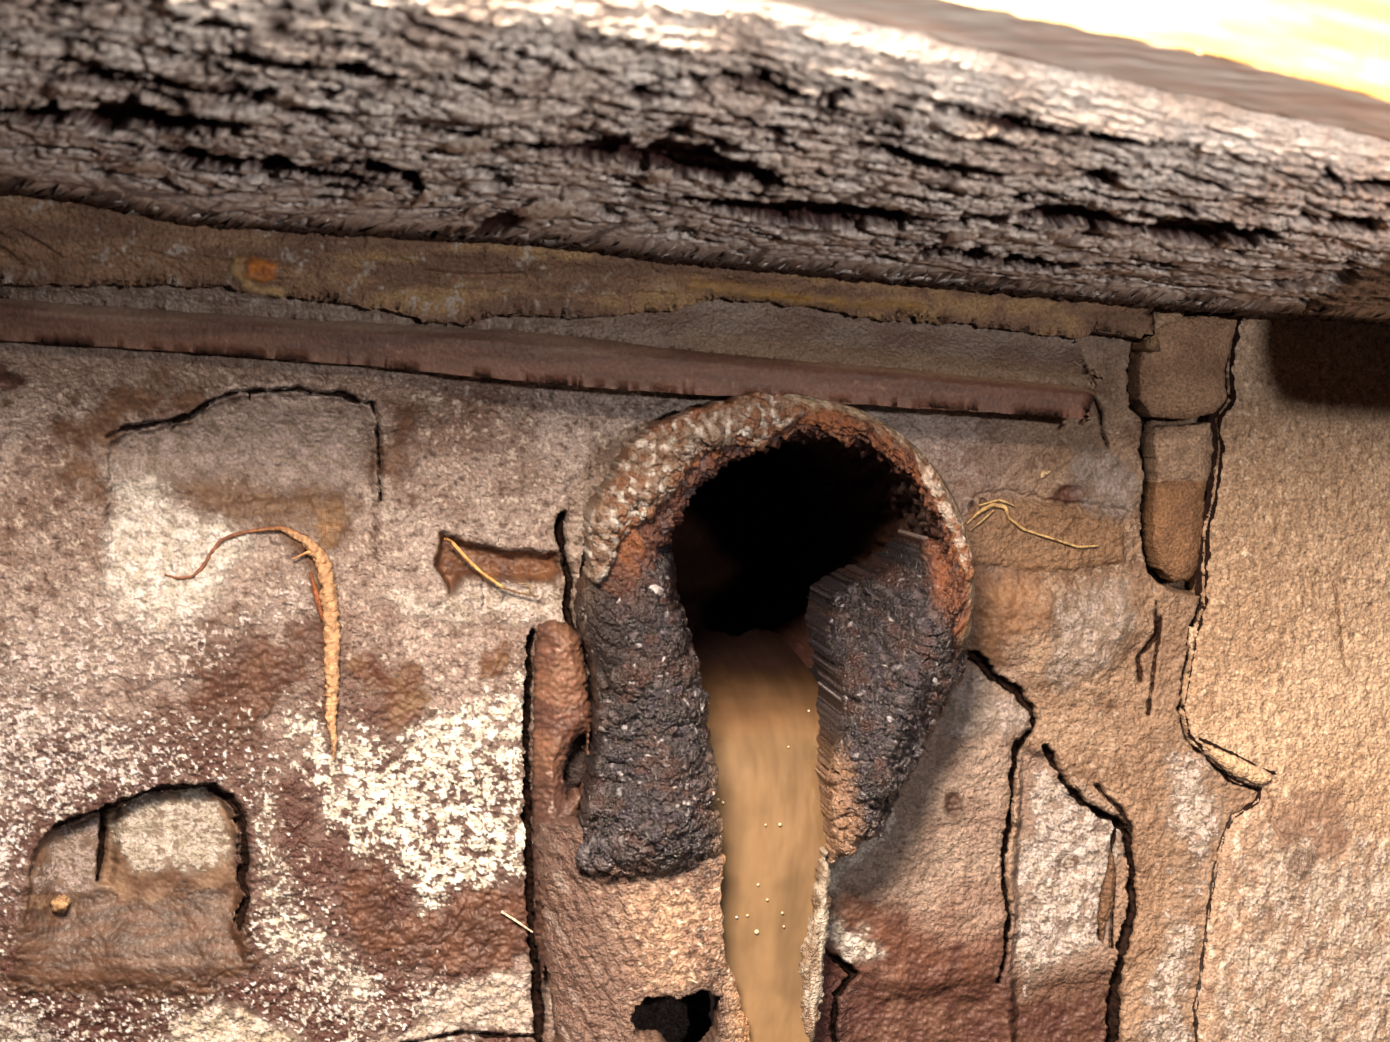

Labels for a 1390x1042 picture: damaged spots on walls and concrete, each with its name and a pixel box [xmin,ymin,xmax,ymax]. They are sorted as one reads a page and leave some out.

rust [231,258,284,296]
rust [0,298,1103,425]
rust [54,370,205,505]
crack [107,387,382,502]
rust [364,398,423,481]
water stain [0,403,564,1042]
crack [1093,312,1284,1042]
crack [966,651,1137,1042]